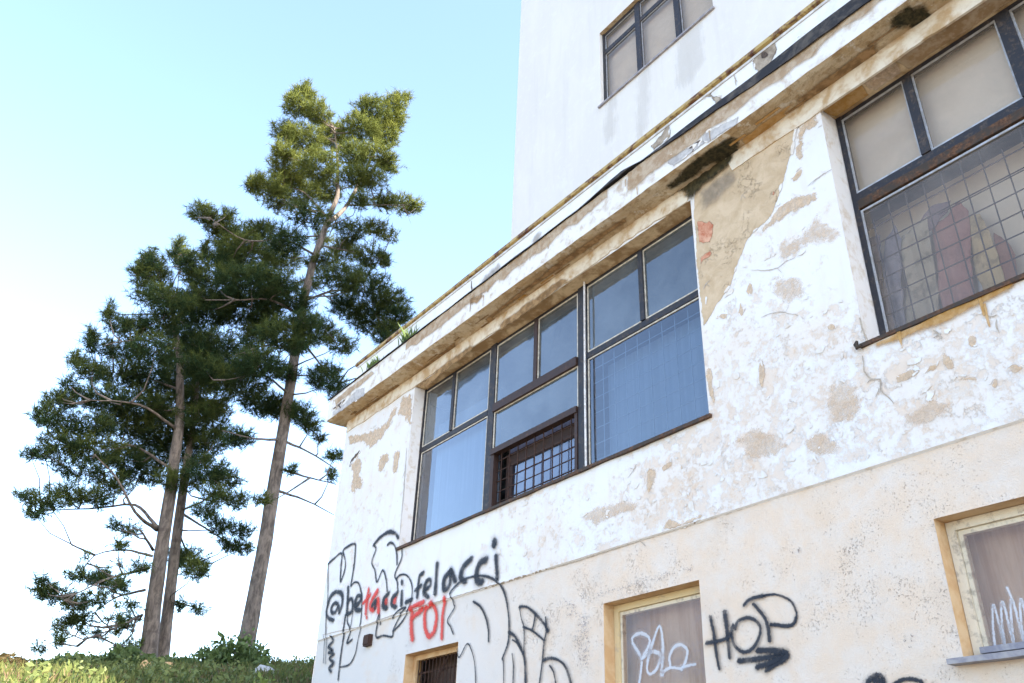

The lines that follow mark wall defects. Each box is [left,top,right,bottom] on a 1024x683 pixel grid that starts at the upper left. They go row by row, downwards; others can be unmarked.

leakage [667,6,931,197]
spalling [668,117,738,166]
spalling [694,0,1012,325]
corrosion [876,284,1012,346]
spalling [333,388,364,415]
peeling [349,395,412,449]
peeling [706,368,715,402]
crack [859,318,894,404]
peeling [897,354,976,383]
peeling [351,456,363,493]
peeling [378,451,400,473]
peeling [646,457,683,492]